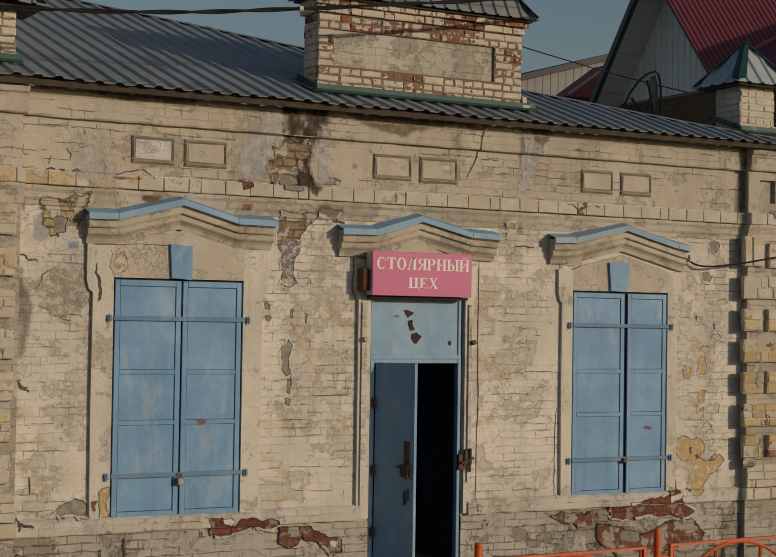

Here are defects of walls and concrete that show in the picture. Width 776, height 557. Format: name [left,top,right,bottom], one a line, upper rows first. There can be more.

damp [238,107,333,195]
spalling [266,138,312,192]
crack [467,125,498,177]
peeling [34,191,92,240]
spalling [274,208,343,291]
peeling [277,336,295,406]
peeling [50,487,110,521]
spalling [550,434,726,557]
spalling [144,515,343,557]